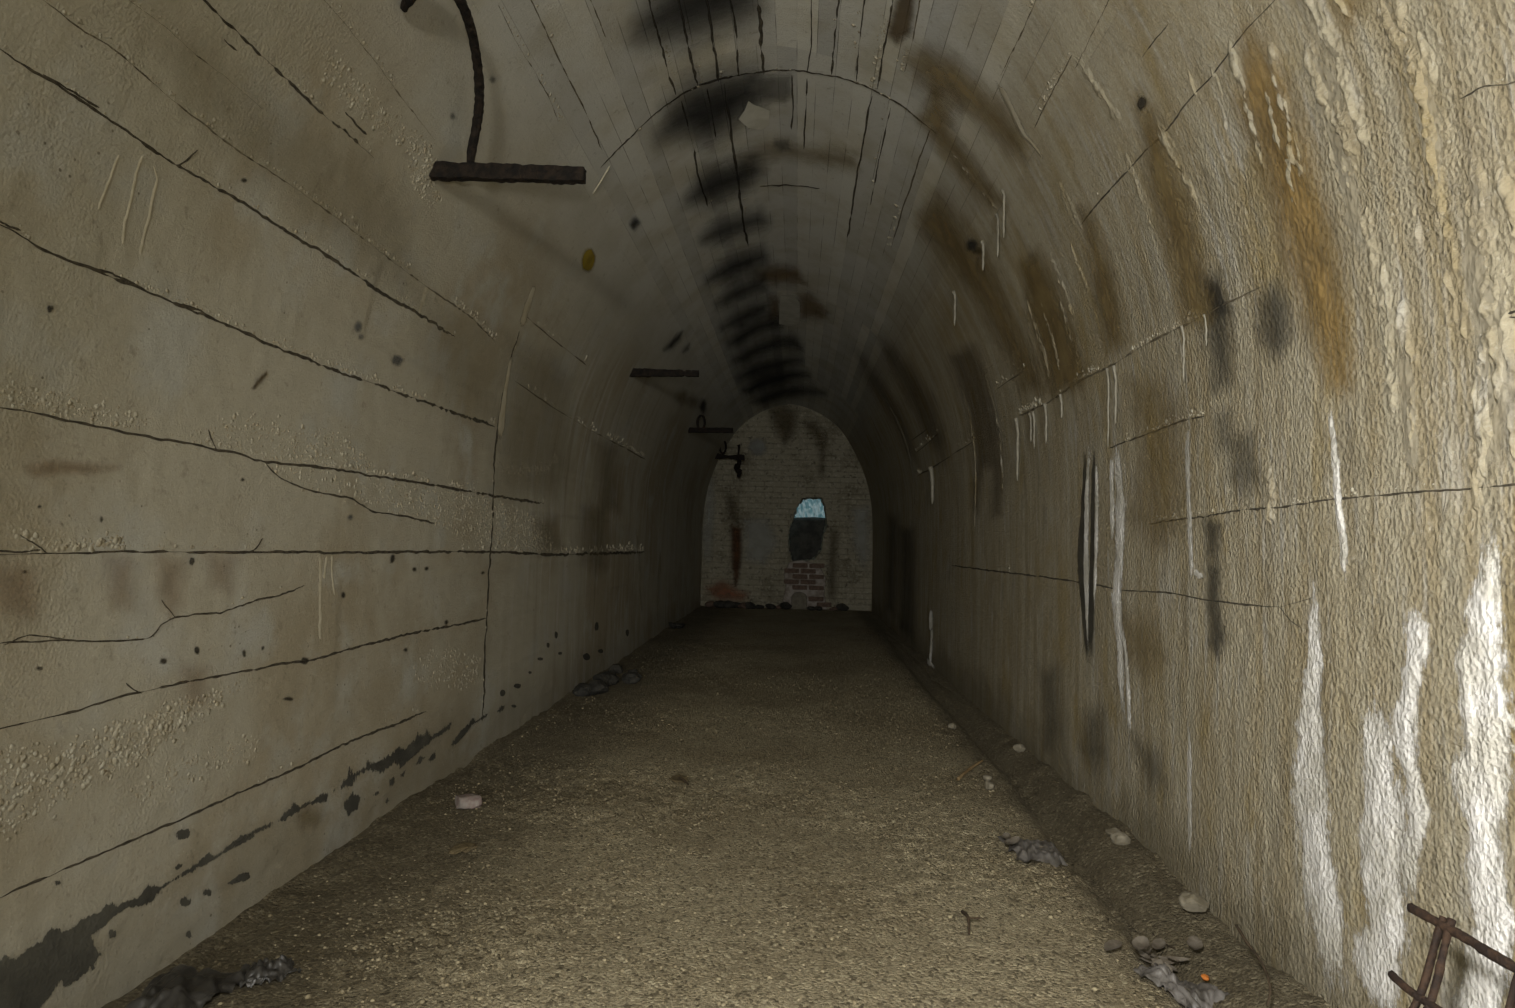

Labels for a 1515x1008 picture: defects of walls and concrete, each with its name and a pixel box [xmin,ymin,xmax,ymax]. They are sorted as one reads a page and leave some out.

crack [0,45,456,337]
crack [0,220,496,427]
crack [648,0,893,246]
corrosion [1245,51,1343,378]
crack [0,407,644,645]
corrosion [732,527,741,584]
water stain [1078,446,1131,729]
water stain [1185,432,1223,651]
water stain [1328,413,1348,572]
crack [0,709,424,898]
water stain [1290,586,1430,1008]
water stain [1451,528,1515,1008]